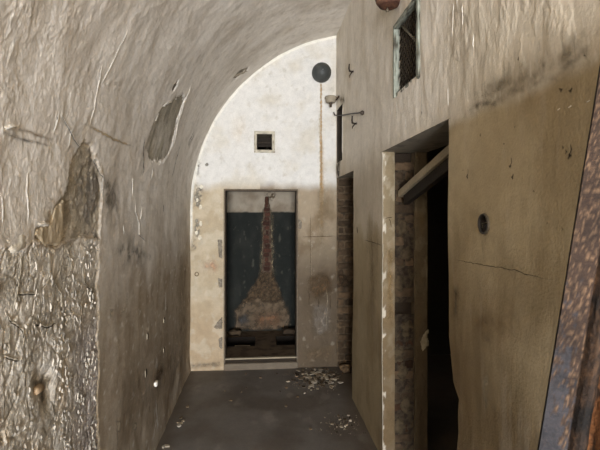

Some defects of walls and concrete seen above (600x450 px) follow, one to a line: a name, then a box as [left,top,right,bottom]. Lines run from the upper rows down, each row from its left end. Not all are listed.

crack [90,31,128,123]
flaking render [145,79,191,162]
flaking render [0,142,117,450]
crack [458,260,560,282]